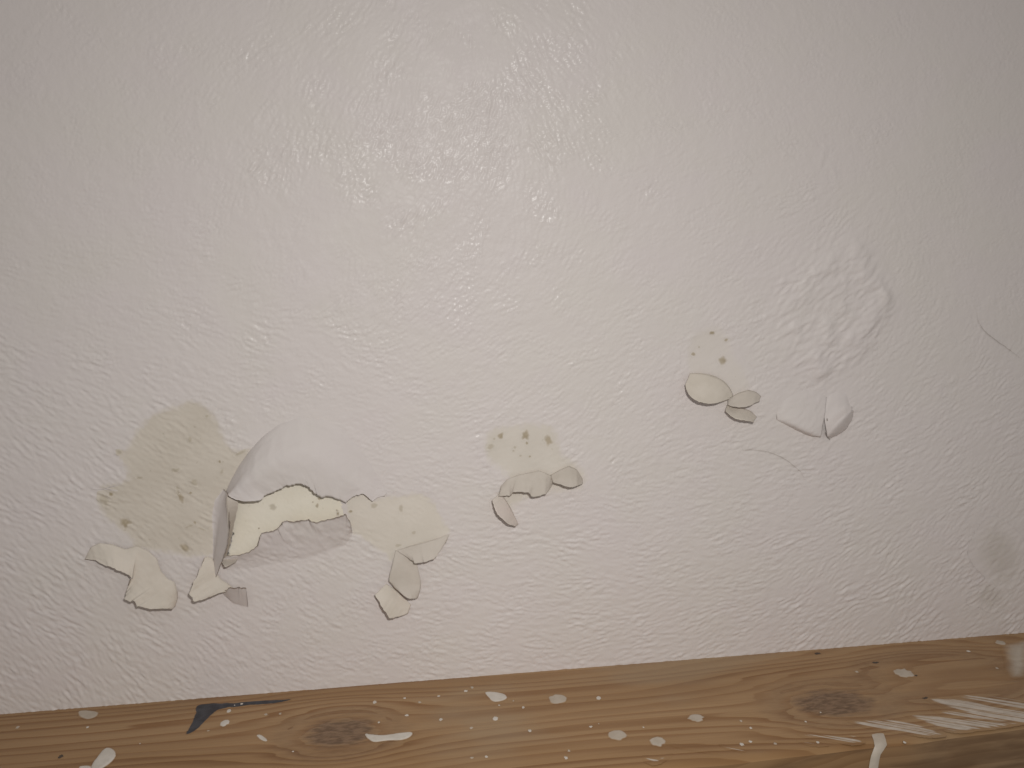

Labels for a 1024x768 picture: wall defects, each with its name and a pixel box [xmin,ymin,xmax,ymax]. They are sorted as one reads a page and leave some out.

peeling [679,318,761,423]
peeling [776,389,854,439]
peeling [85,396,454,618]
peeling [477,416,592,527]